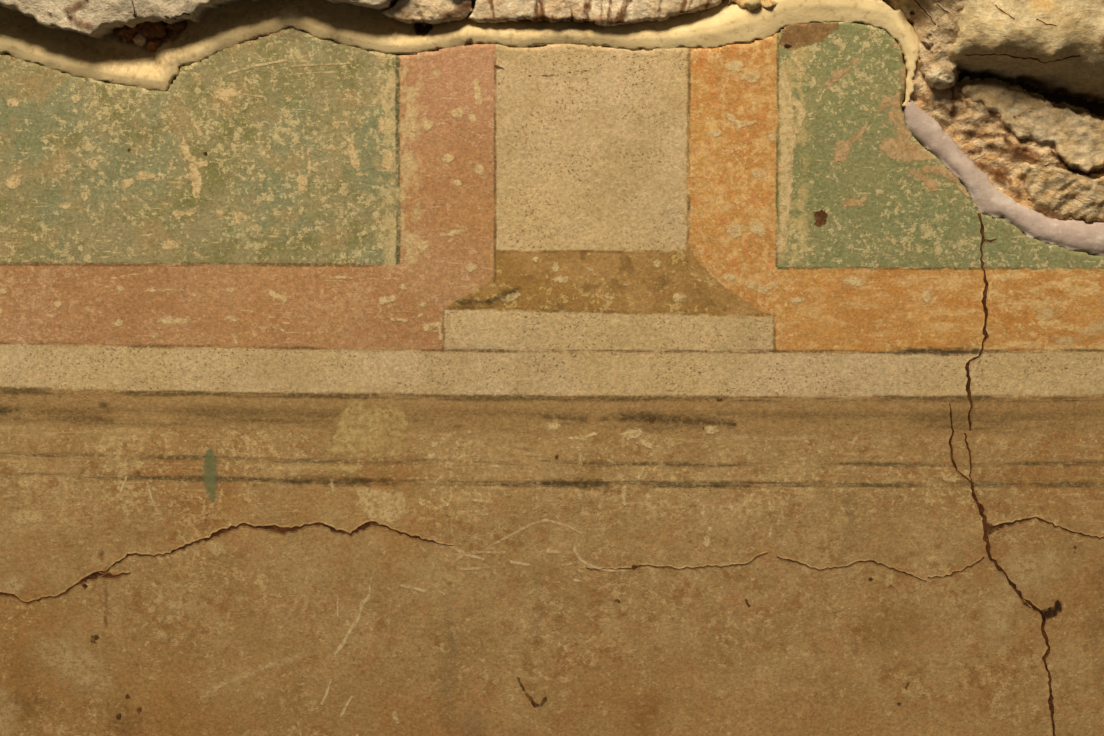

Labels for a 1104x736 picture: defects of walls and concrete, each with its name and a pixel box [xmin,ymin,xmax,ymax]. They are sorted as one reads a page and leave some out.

peeling [725,60,761,83]
peeling [450,79,482,121]
crack [0,207,1104,736]